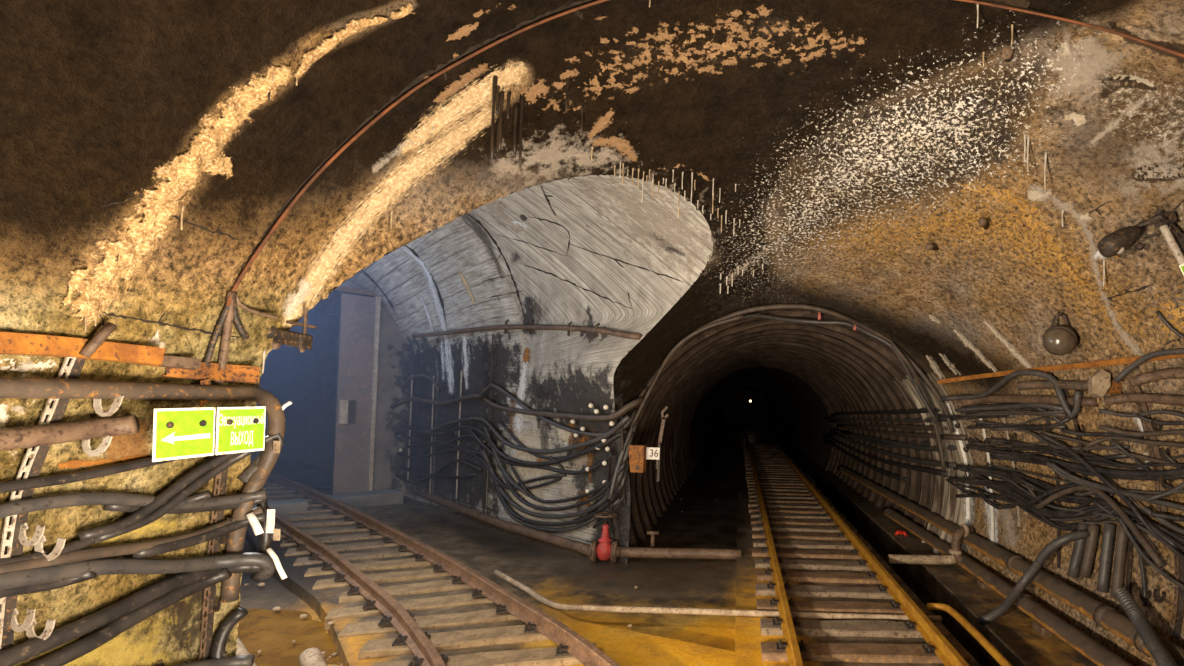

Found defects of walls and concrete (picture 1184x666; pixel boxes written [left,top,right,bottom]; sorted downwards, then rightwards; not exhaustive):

peeling [446,3,516,61]
peeling [494,5,866,188]
crack [466,186,690,322]
damp [383,246,638,575]